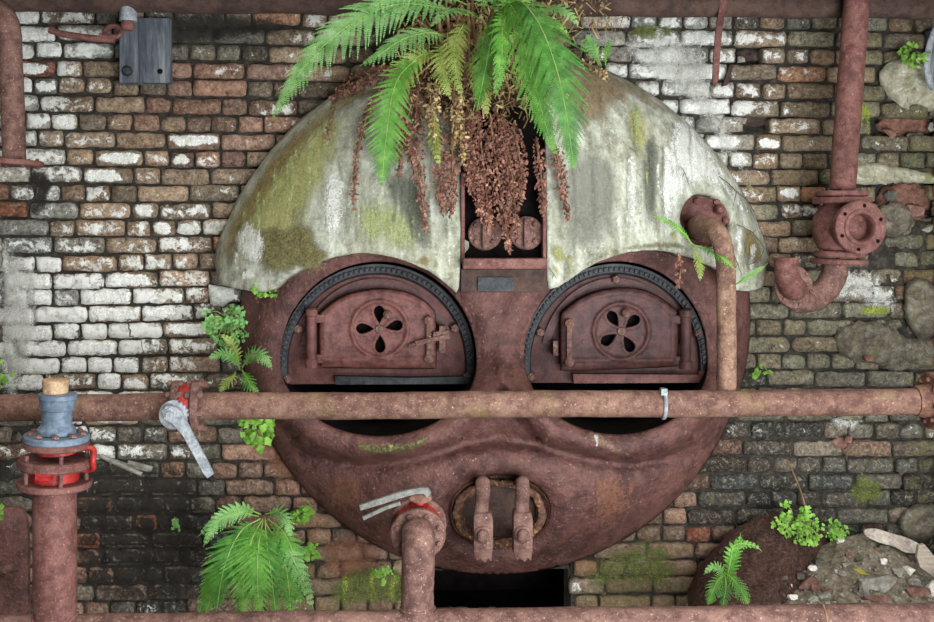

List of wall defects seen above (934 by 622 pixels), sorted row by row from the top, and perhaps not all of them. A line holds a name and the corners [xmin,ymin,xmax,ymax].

leakage [1,242,36,394]